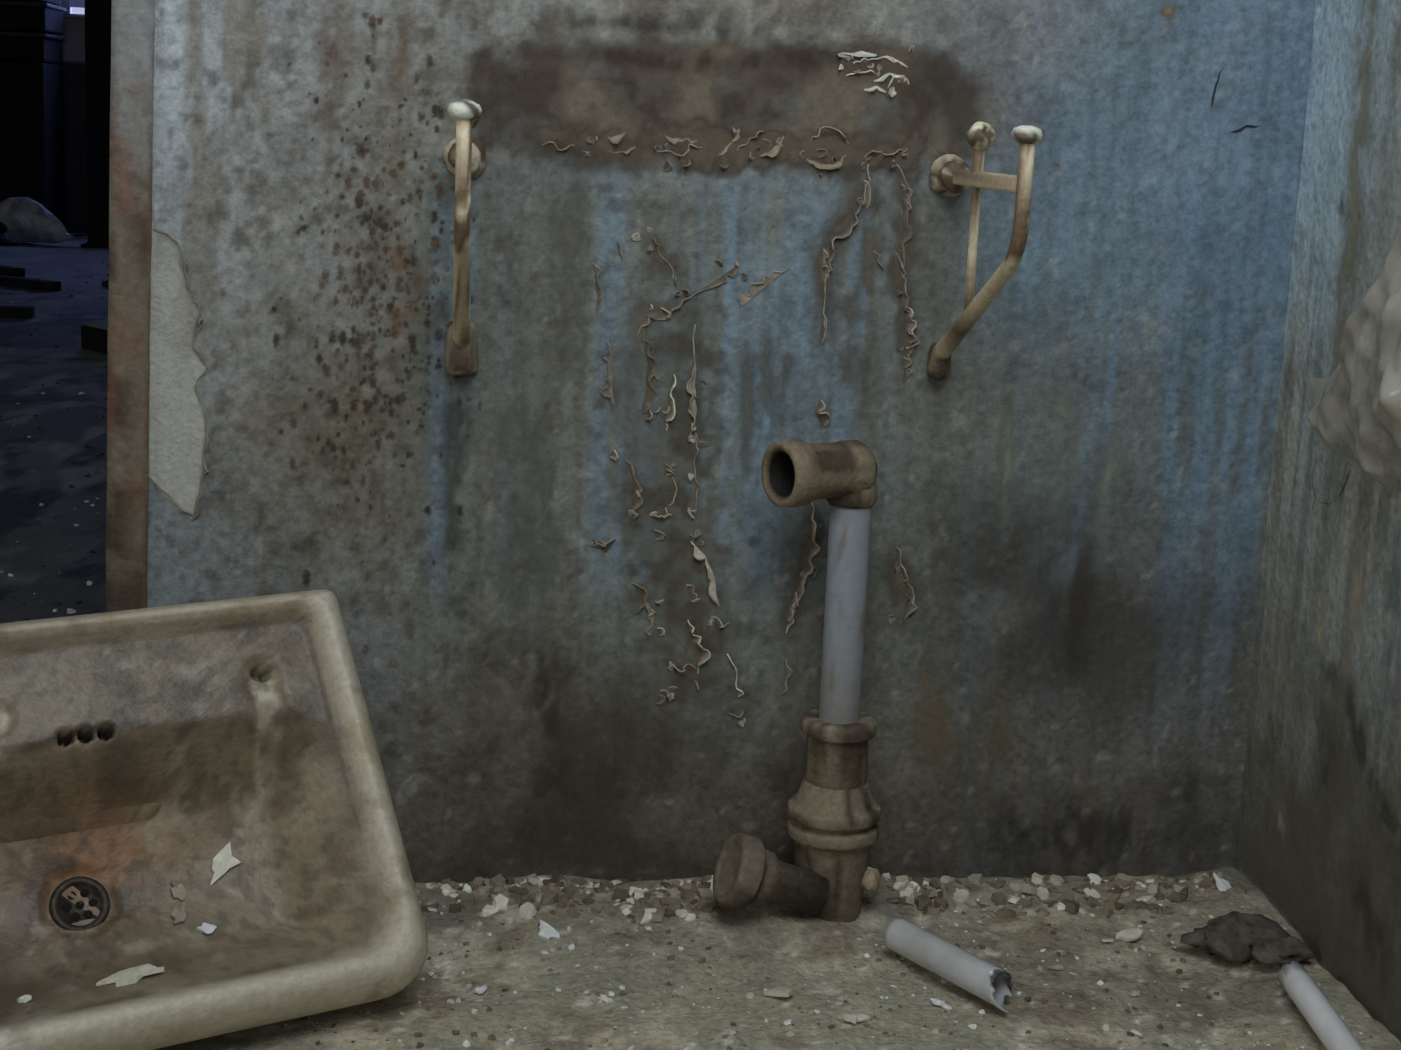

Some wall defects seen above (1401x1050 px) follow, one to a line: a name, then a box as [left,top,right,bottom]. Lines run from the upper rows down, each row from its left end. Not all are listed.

peeling [149,210,209,521]
rust [296,98,461,509]
peeling [591,227,789,727]
peeling [526,117,925,383]
peeling [784,503,821,633]
peeling [815,400,832,428]
peeling [838,45,914,97]
water stain [1341,0,1375,278]
water stain [1253,690,1401,997]